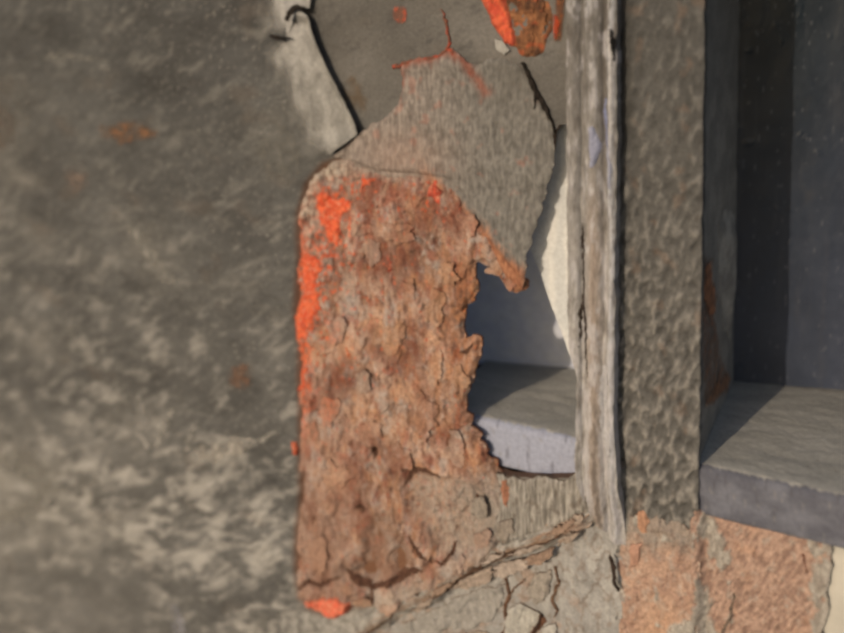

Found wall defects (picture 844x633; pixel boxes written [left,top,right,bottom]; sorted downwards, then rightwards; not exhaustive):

peeling [269,0,555,290]
crack [520,62,556,134]
rust [291,159,530,618]
peeling [255,471,593,633]
crack [501,576,526,633]
crack [550,566,561,618]